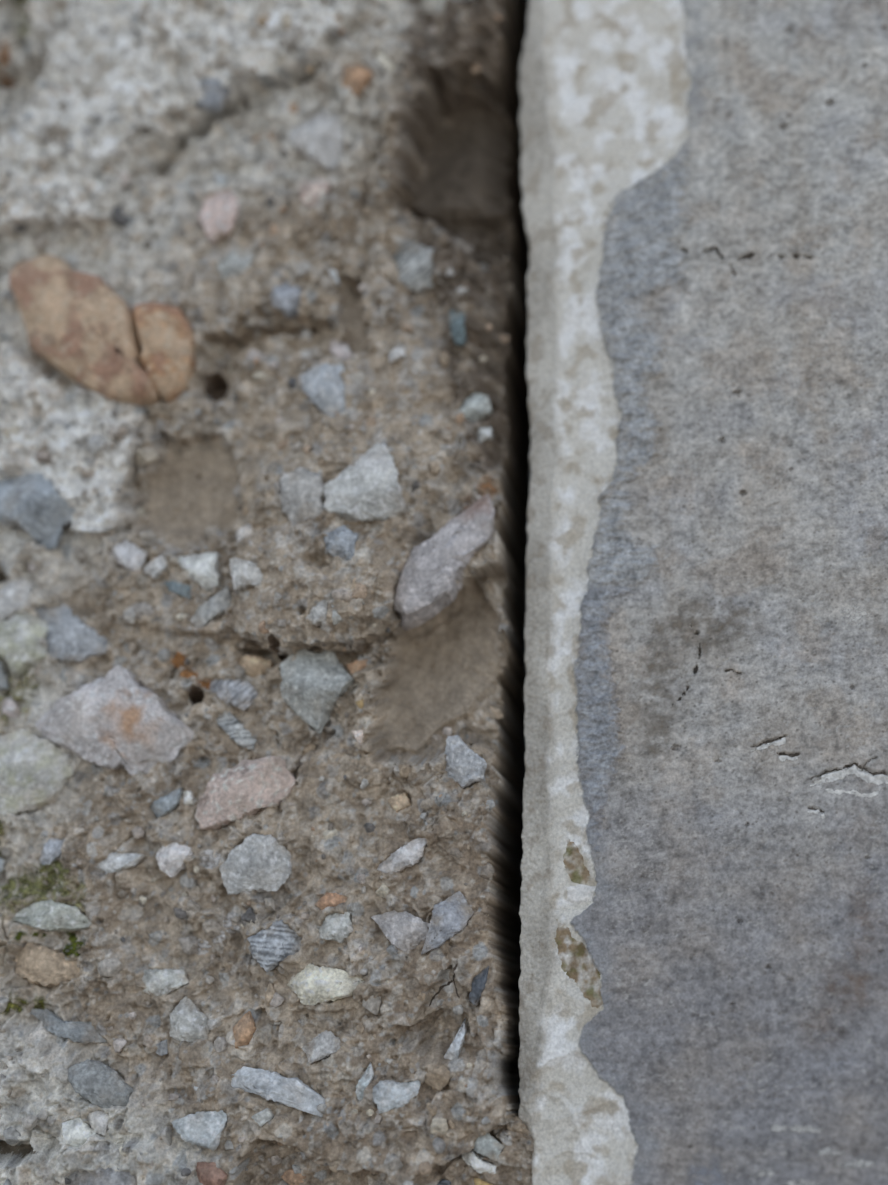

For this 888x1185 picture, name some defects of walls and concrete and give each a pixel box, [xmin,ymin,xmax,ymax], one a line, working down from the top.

peeling [533,0,694,1185]
crack [750,736,888,819]